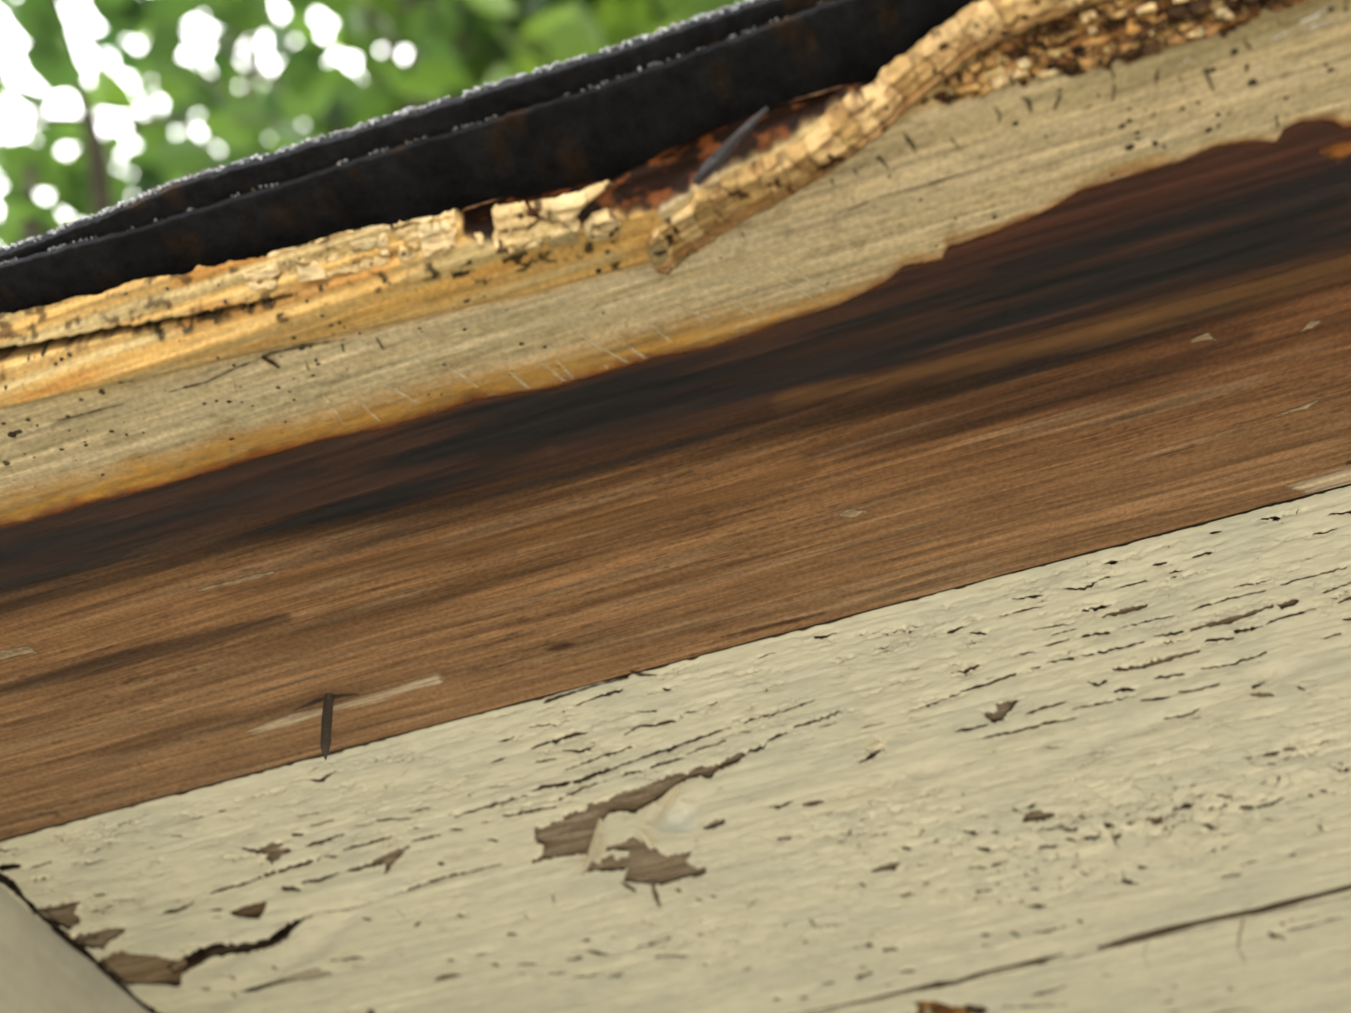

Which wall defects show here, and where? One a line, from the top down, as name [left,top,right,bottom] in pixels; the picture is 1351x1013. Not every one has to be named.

peeling [991,57,1057,89]
water stain [1221,32,1257,86]
spalling [241,209,459,292]
spalling [474,180,621,254]
water stain [0,107,1351,613]
water stain [729,613,824,636]
crack [934,531,1351,748]
crack [167,670,879,977]
peeling [532,732,786,906]
crack [859,740,1349,935]
crack [0,849,159,1013]
peeling [37,902,187,983]